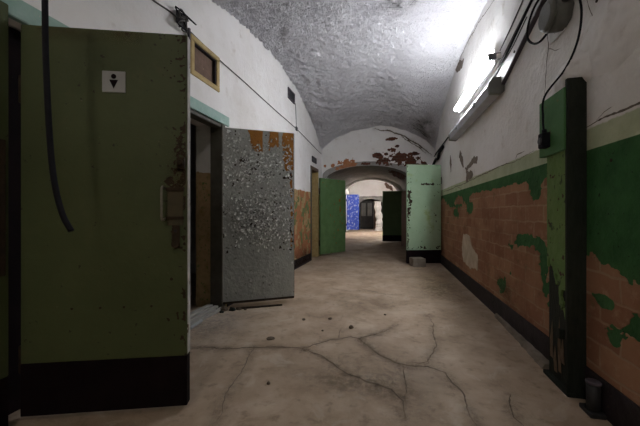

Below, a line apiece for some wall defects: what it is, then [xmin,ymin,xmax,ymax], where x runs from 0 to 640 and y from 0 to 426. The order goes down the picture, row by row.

peeling [222,129,311,264]
spalling [323,137,428,207]
crack [377,129,431,154]
flaking render [459,151,478,182]
crack [587,102,640,127]
peeling [420,177,549,337]
crack [213,317,476,424]
peeling [586,252,640,406]